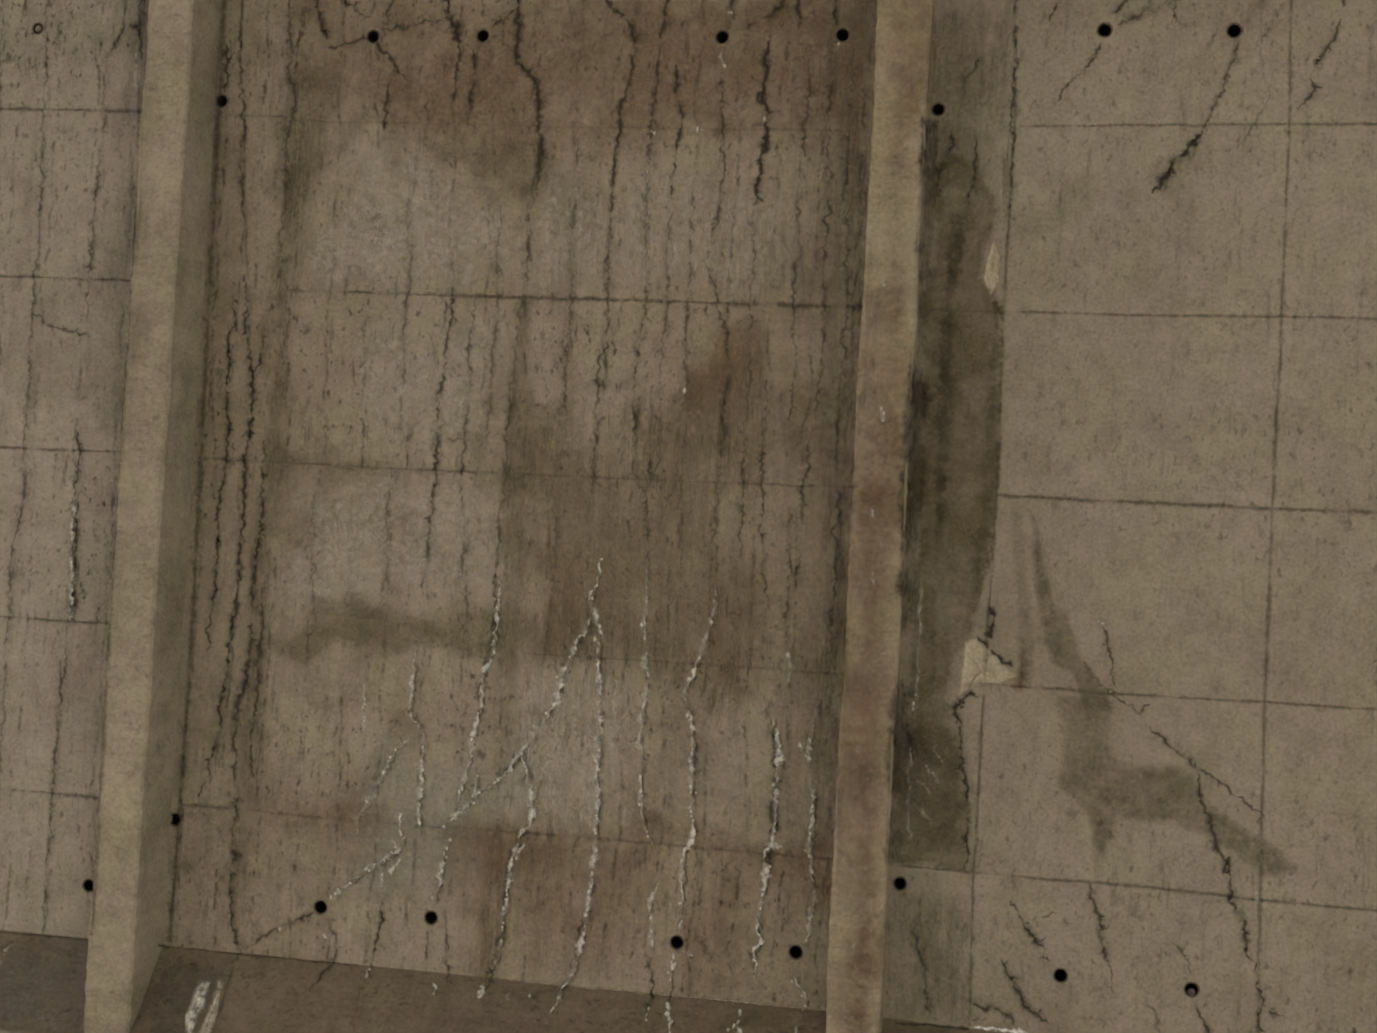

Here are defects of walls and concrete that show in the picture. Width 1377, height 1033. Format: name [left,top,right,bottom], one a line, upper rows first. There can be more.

crack [1152,35,1266,193]
water stain [186,981,222,1033]
crack [198,28,337,989]
water stain [287,587,564,963]
crack [280,0,578,701]
water stain [550,713,613,1014]
water stain [678,710,698,927]
crack [564,0,854,676]
water stain [751,683,838,977]
water stain [890,118,1000,869]
spalling [959,638,1017,696]
crack [1084,627,1284,1033]